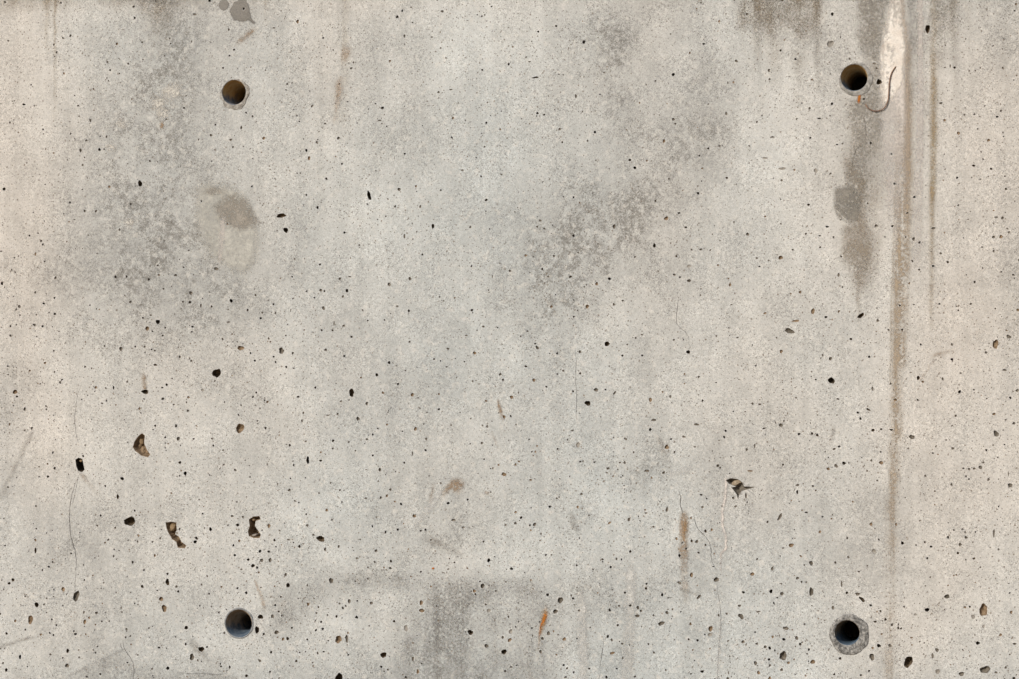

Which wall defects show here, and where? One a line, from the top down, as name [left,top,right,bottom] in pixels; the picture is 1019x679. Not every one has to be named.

water stain [834,158,870,267]
water stain [853,0,936,458]
corrosion [679,514,688,558]